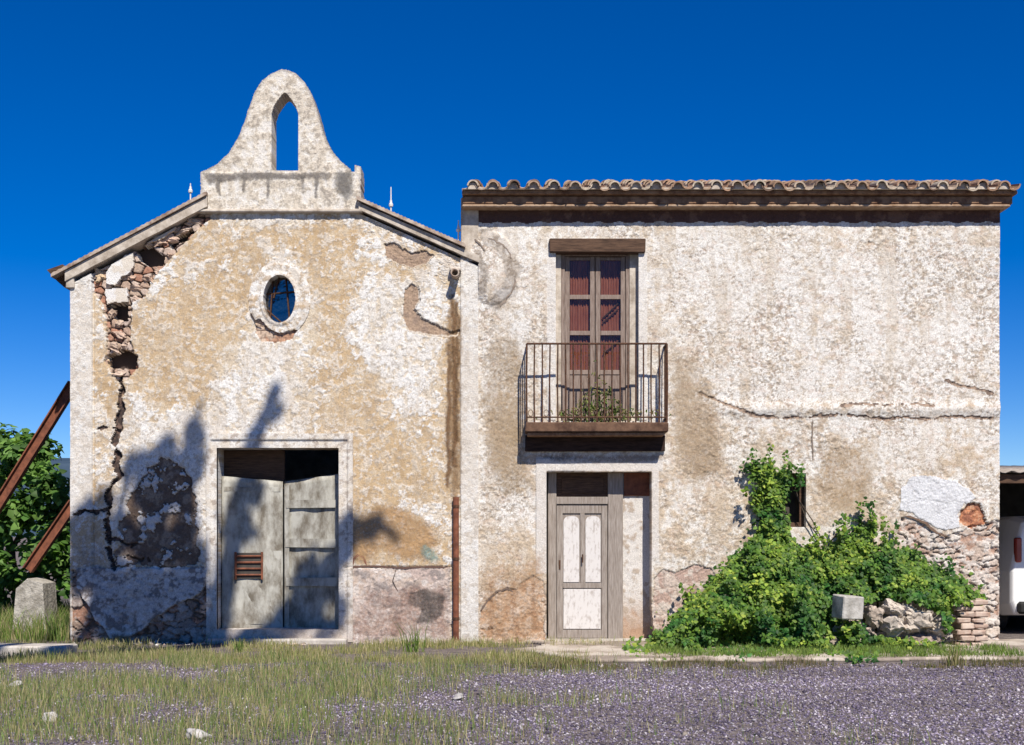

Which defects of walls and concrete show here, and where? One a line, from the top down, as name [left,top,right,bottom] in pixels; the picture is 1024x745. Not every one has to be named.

flaking render [384,242,434,269]
flaking render [402,284,459,337]
crack [73,214,210,572]
water stain [446,295,461,497]
crack [699,379,994,458]
flaking render [113,457,201,568]
flaking render [72,570,207,643]
flaking render [897,503,1000,640]